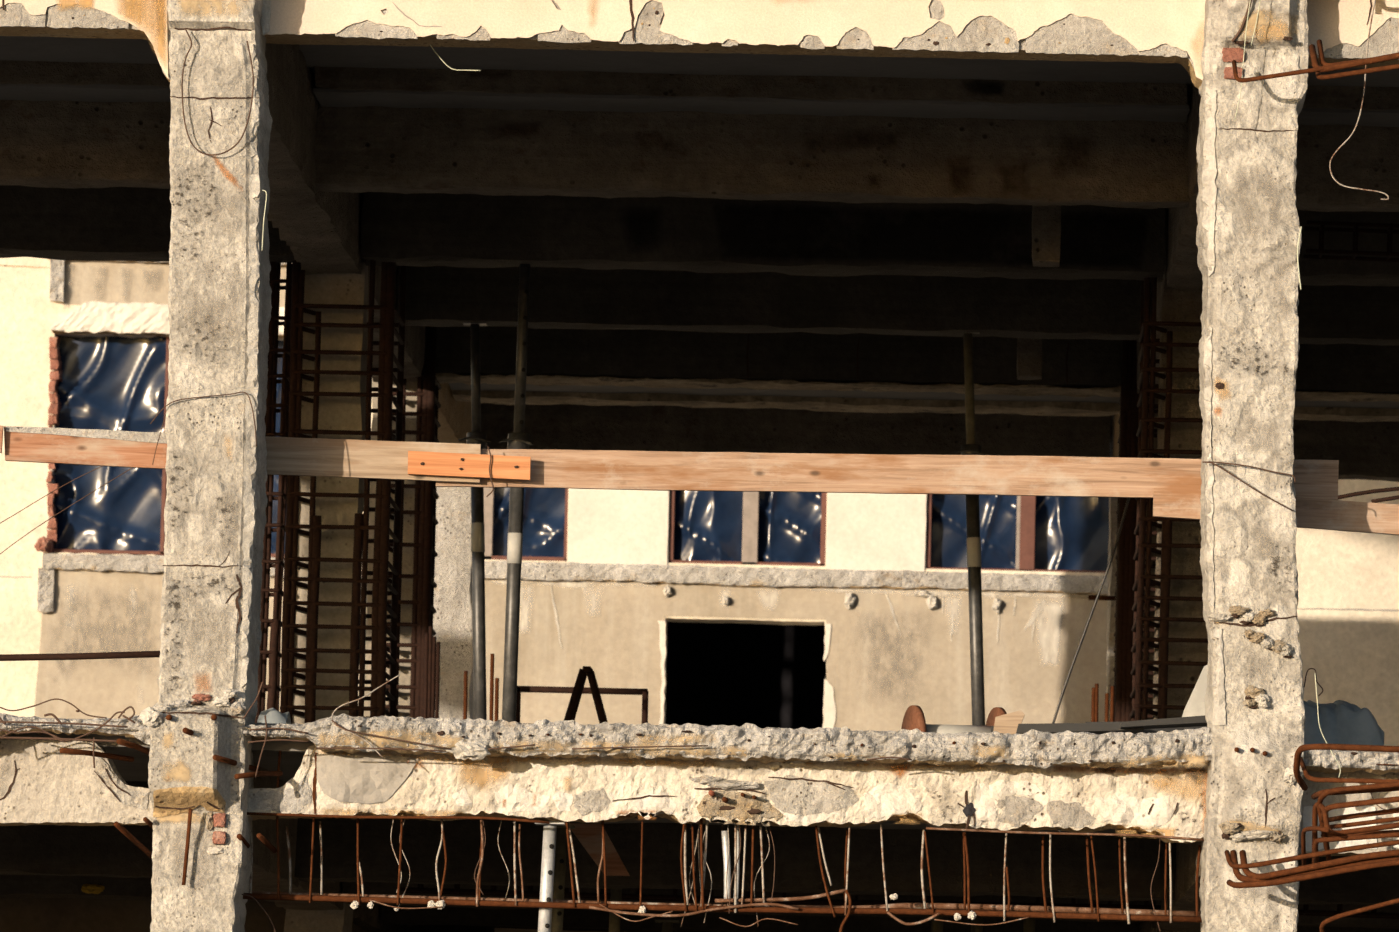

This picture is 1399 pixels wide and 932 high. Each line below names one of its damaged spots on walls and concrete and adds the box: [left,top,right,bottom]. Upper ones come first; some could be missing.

peeling [335,9,418,40]
peeling [436,26,491,41]
peeling [538,0,591,44]
peeling [619,0,693,46]
peeling [800,27,874,50]
peeling [892,0,1187,58]
crack [170,96,259,142]
spalling [1243,685,1270,709]
spalling [243,621,1205,931]
corrosion [1120,828,1174,836]
spalling [1218,821,1285,842]